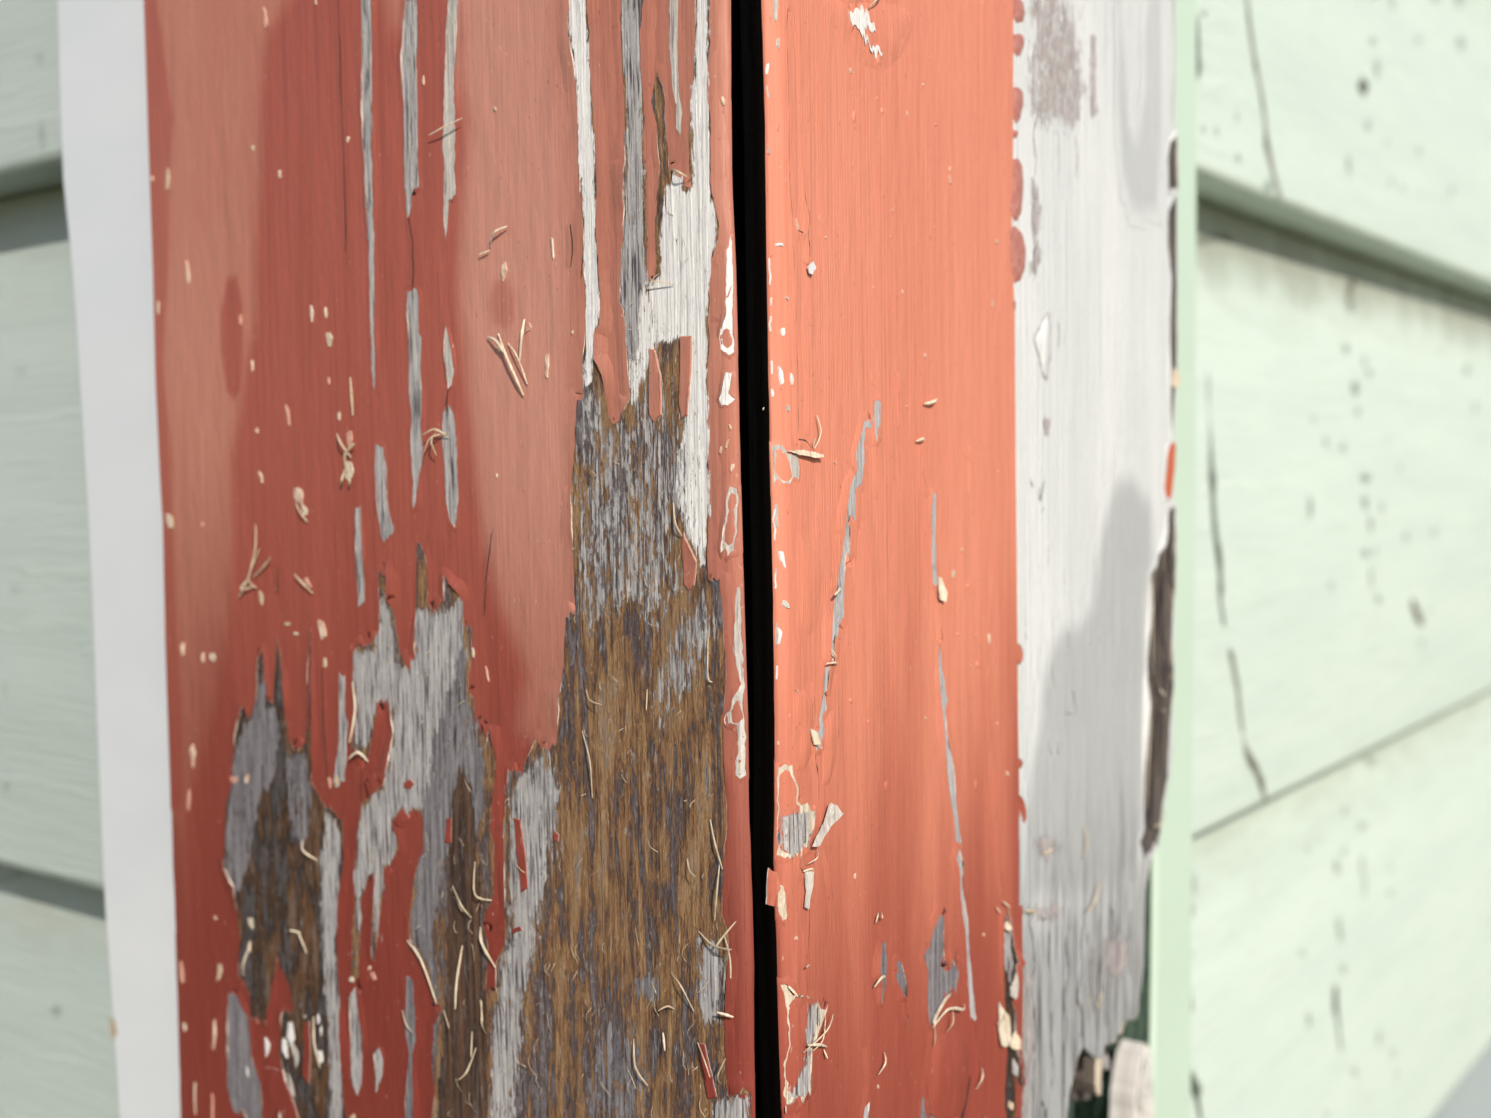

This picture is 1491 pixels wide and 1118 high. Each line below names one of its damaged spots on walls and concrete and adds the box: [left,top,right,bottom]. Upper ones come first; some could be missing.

peeling [765,0,780,98]
peeling [839,0,911,73]
peeling [768,243,789,336]
peeling [1162,0,1181,503]
peeling [762,360,794,411]
peeling [194,0,755,1118]
peeling [180,642,216,662]
peeling [766,371,887,1118]
peeling [872,443,1026,1118]
peeling [1109,1039,1154,1118]